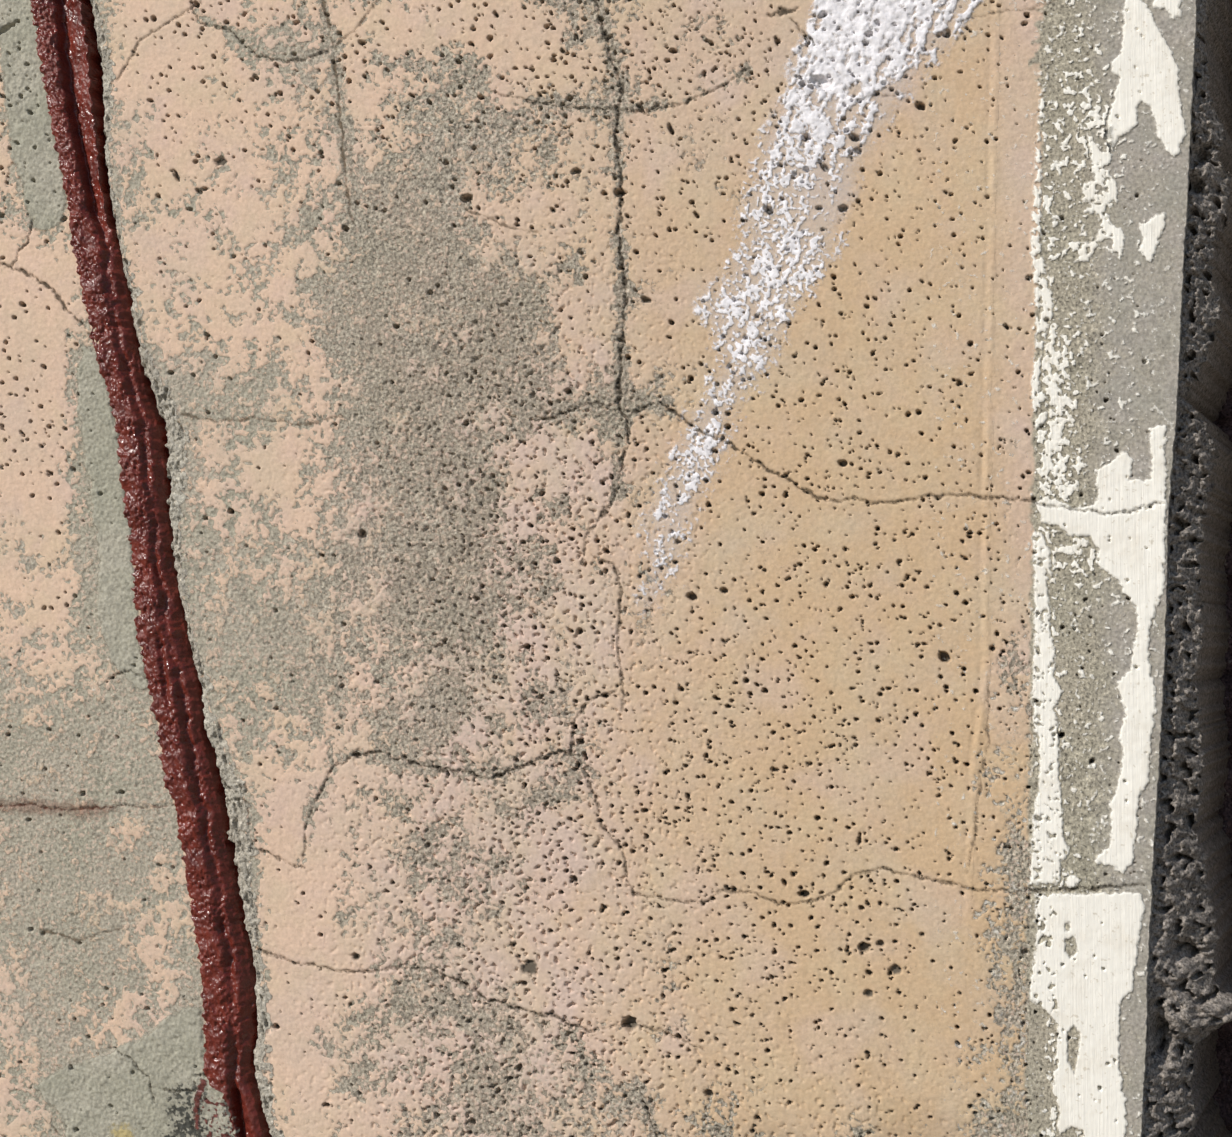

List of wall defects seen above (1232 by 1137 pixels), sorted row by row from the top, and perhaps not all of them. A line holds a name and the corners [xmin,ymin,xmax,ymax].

peeling [95,0,126,60]
crack [0,0,697,1137]
peeling [108,0,775,1137]
crack [304,0,1161,905]
water stain [633,0,982,603]
peeling [812,1112,875,1137]